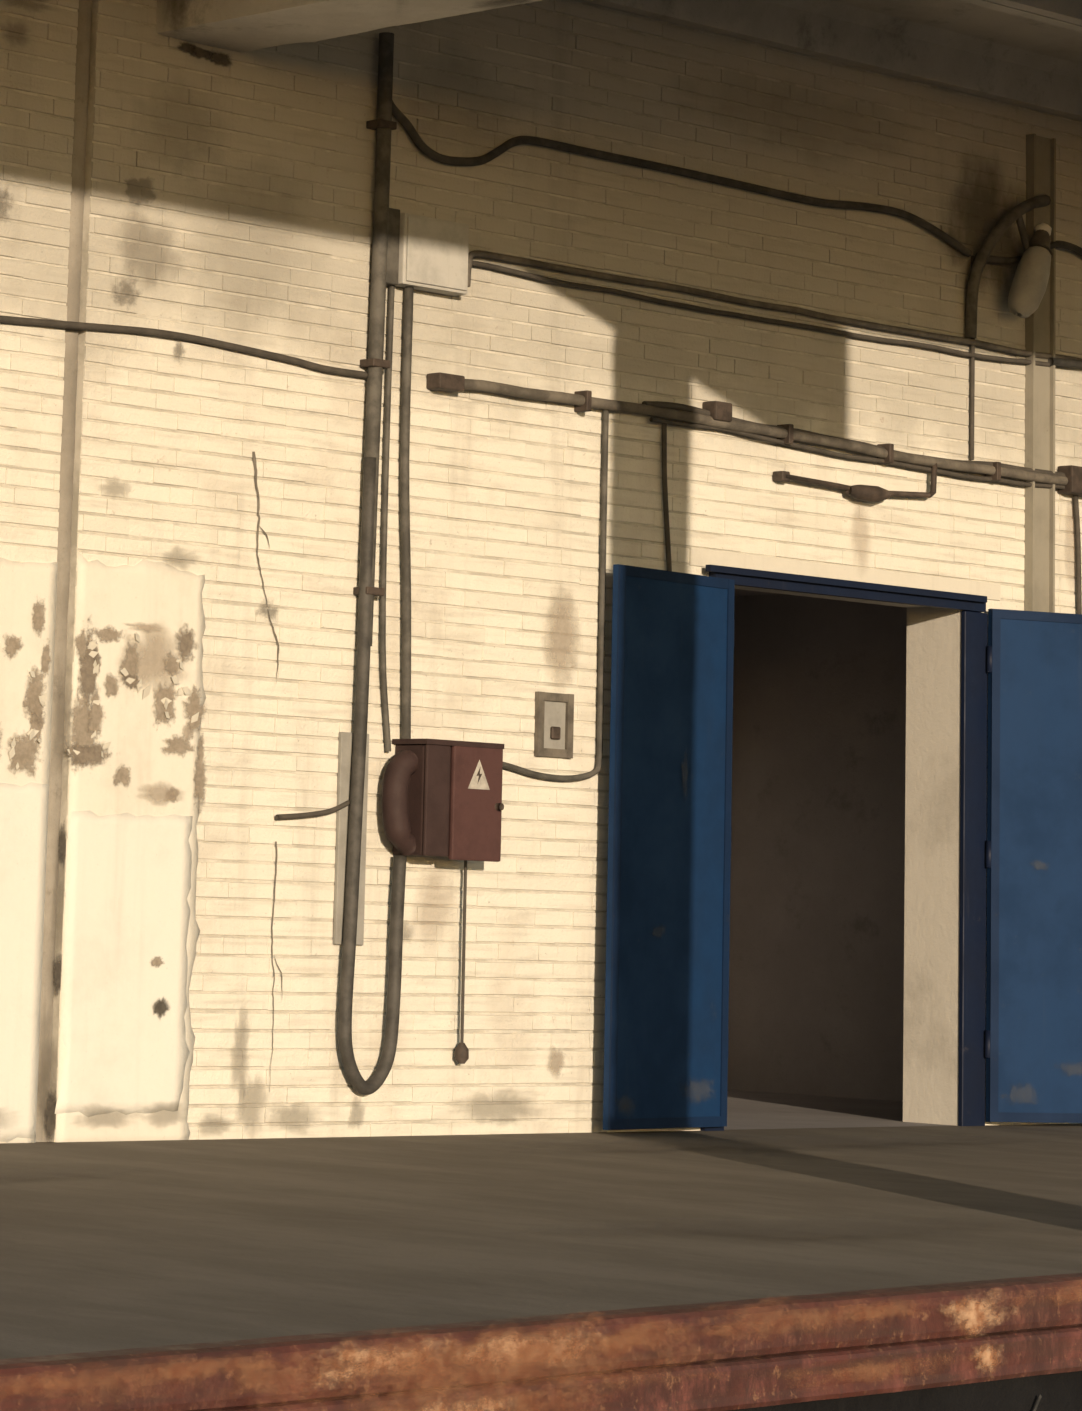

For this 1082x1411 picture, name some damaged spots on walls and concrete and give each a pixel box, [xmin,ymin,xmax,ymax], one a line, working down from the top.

crack [252,452,279,683]
flaking render [0,602,51,775]
flaking render [65,619,206,813]
rust [949,1300,1000,1333]
rust [314,1334,635,1385]
rust [977,1347,997,1369]
rust [423,1398,503,1411]